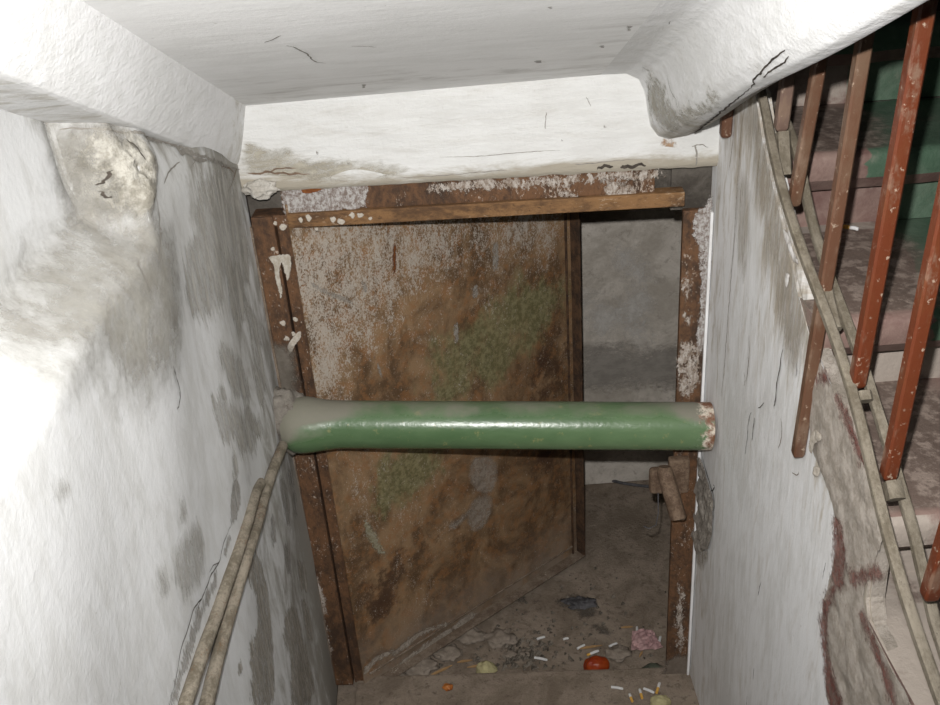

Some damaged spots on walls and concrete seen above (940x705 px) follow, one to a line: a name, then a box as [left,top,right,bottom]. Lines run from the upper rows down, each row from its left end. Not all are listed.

damp [0,122,266,490]
crack [60,127,307,291]
peeling [269,247,291,298]
damp [246,144,397,179]
peeling [273,186,372,231]
peeling [426,168,663,197]
peeling [675,196,713,398]
crack [692,50,789,393]
crack [169,524,232,705]